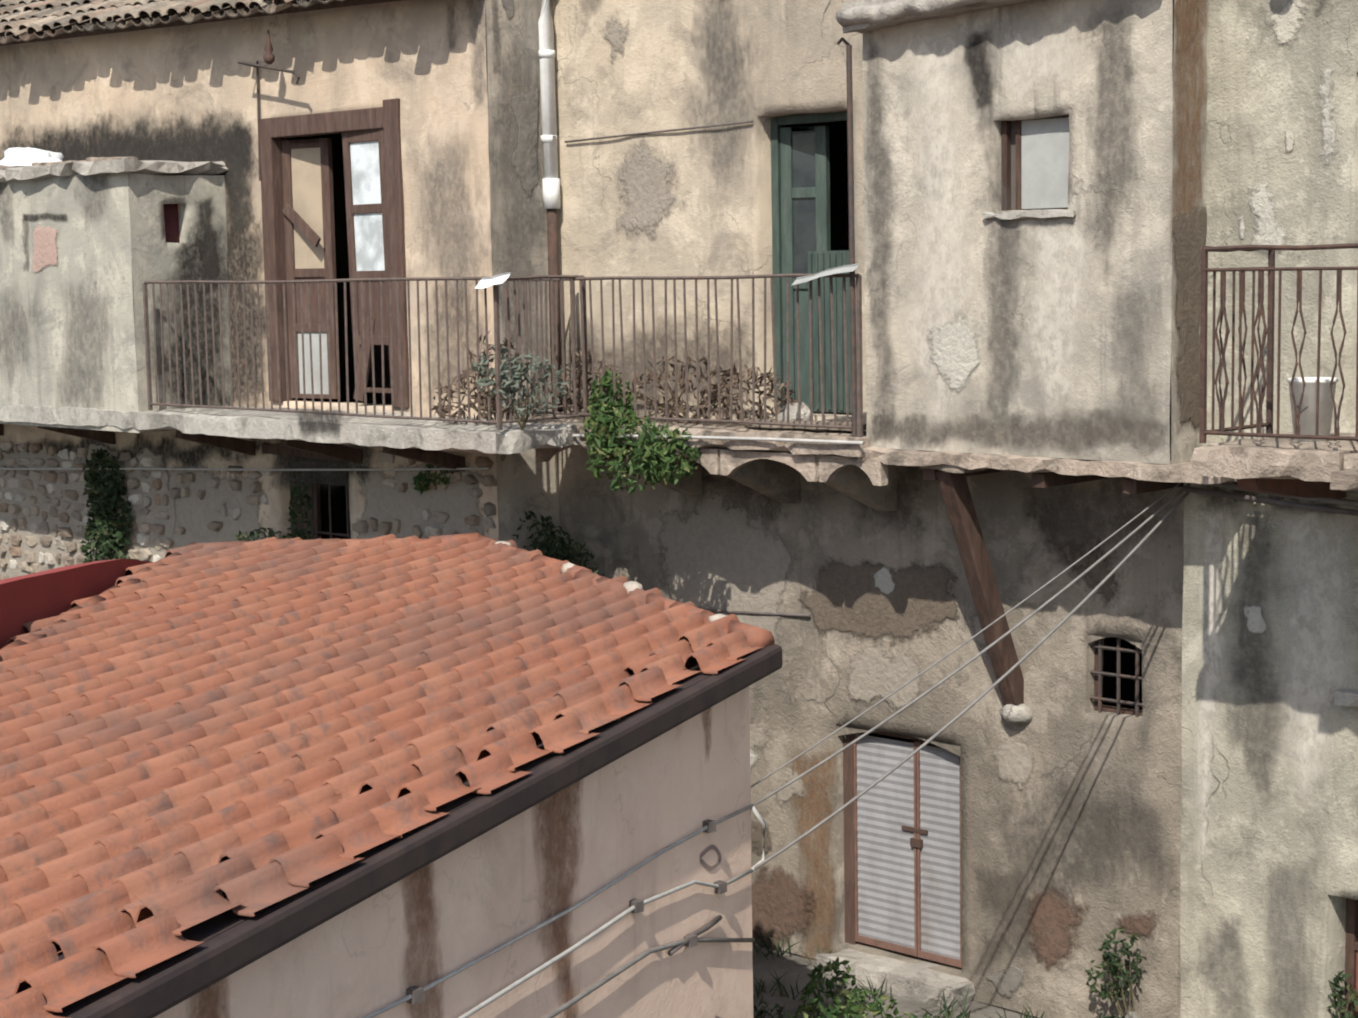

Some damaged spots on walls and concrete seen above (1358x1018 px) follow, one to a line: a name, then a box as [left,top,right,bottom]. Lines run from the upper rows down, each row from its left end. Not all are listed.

peeling [604,17,628,62]
peeling [616,139,685,238]
leakage [871,23,1157,450]
peeling [1239,183,1286,254]
peeling [659,488,987,709]
peeling [750,724,768,768]
spalling [993,740,1034,790]
spalling [751,755,835,960]
spalling [1028,890,1087,968]
spalling [1119,915,1155,938]